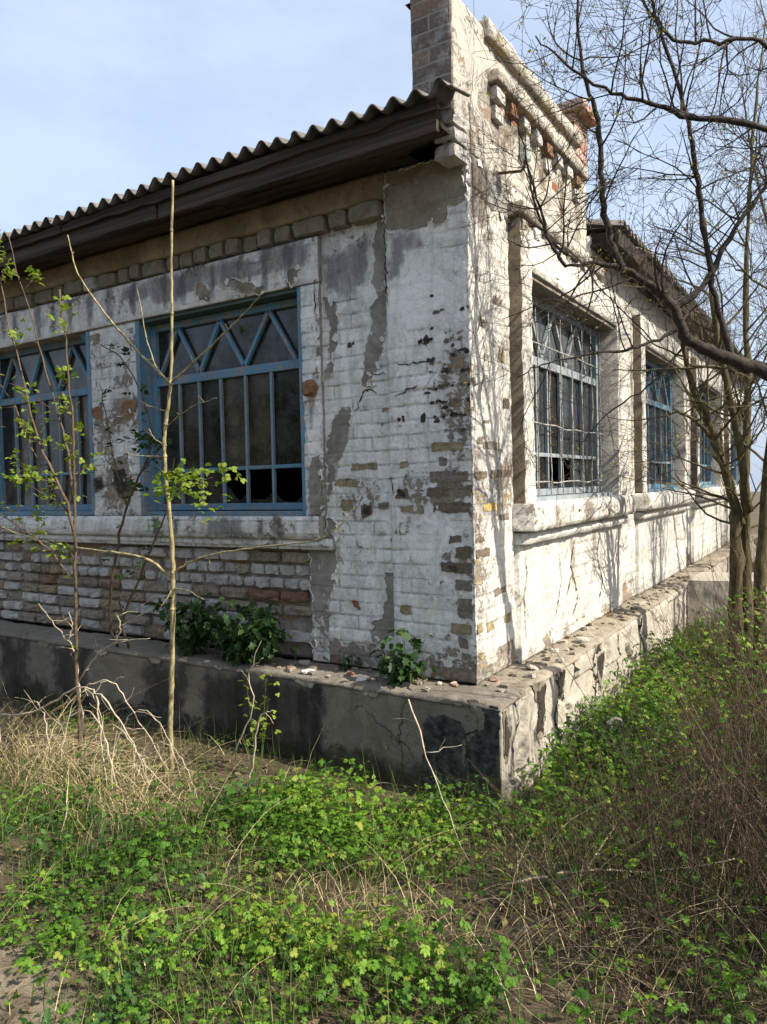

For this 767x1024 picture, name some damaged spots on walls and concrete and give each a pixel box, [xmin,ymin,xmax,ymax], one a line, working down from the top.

peeling [92,399,137,427]
crack [355,342,434,412]
peeling [94,452,132,494]
peeling [307,308,511,654]
peeling [434,535,511,681]
crack [522,552,530,645]
crack [554,536,621,624]
damp [191,675,535,818]
crack [354,698,416,767]
spalling [525,663,566,743]